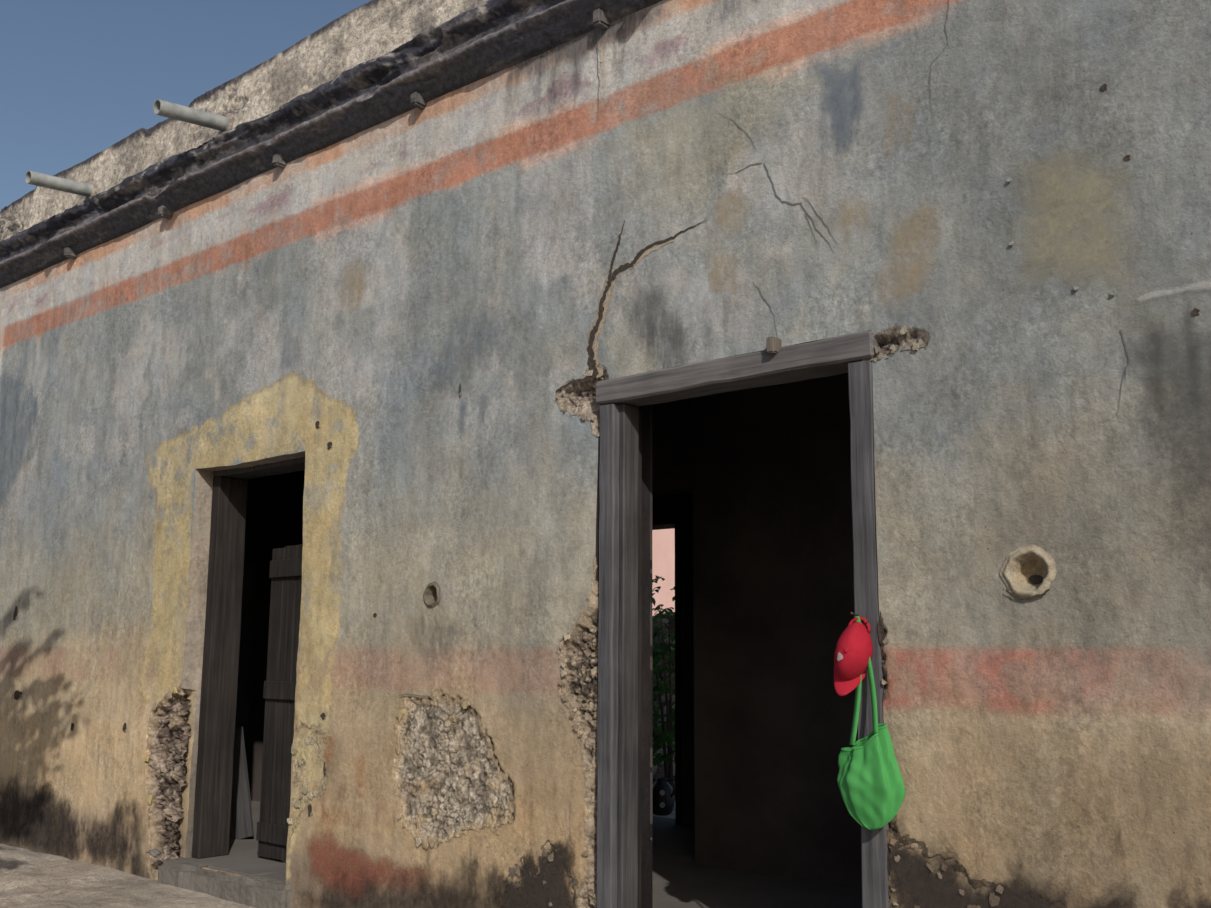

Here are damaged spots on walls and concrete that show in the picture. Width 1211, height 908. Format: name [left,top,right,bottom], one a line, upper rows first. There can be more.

crack [720,114,837,249]
crack [556,219,709,392]
flaking render [555,364,608,437]
flaking render [392,688,515,849]
flaking render [500,555,599,908]
damp [0,780,144,877]
damp [321,842,576,908]
damp [887,844,1066,908]
damp [1091,897,1134,908]